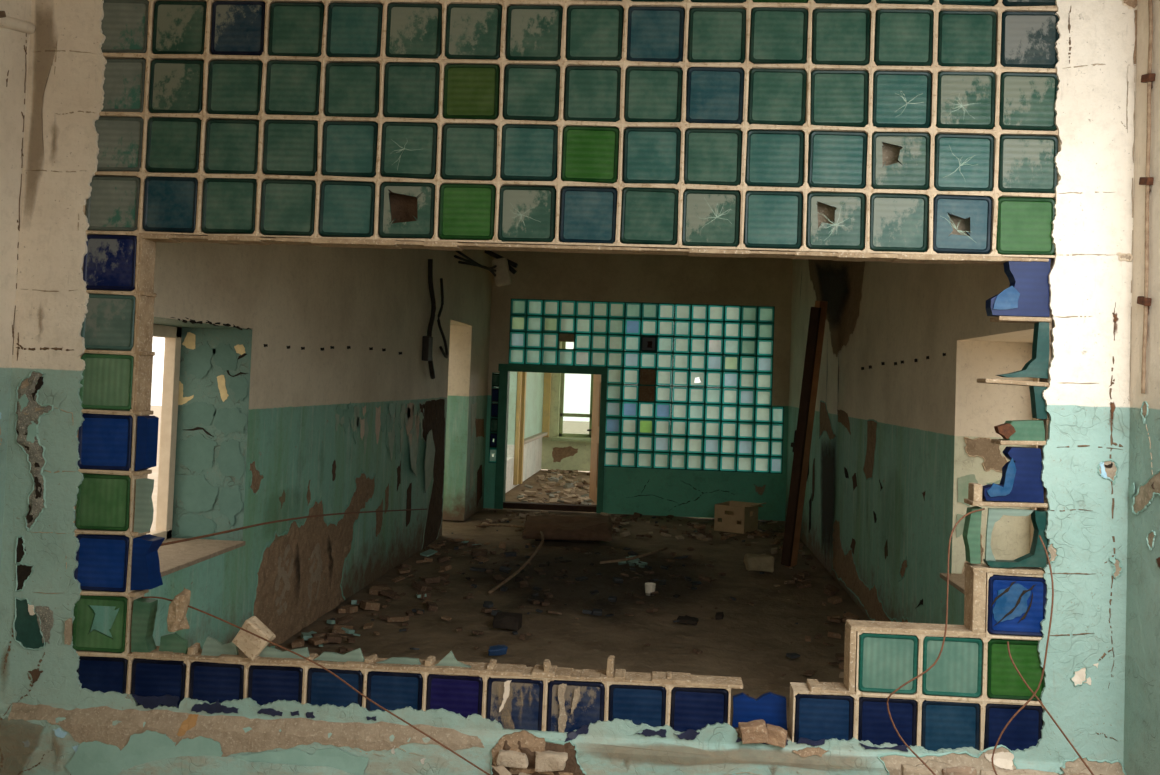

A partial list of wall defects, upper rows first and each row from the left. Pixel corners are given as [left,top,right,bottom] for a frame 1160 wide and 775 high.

peeling [12,370,72,651]
flaking render [252,397,446,648]
flaking render [956,437,1008,538]
flaking render [1097,459,1119,485]
flaking render [1128,470,1160,516]
peeling [8,693,589,775]
peeling [636,729,700,740]
peeling [786,737,825,746]
flaking render [860,743,1126,775]